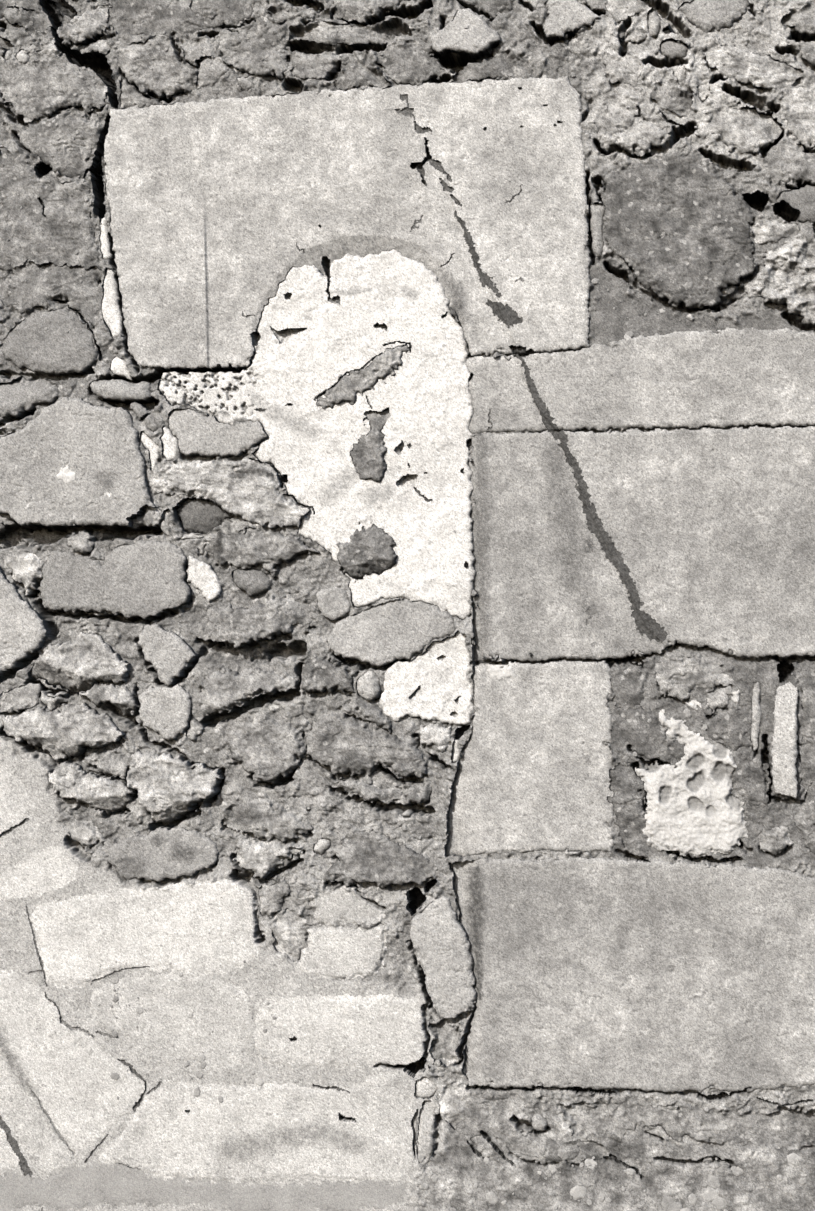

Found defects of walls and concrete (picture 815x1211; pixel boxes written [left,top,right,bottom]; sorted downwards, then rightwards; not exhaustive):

spalling [251,327,307,346]
crack [395,94,668,642]
spalling [395,441,428,487]
spalling [450,696,471,740]